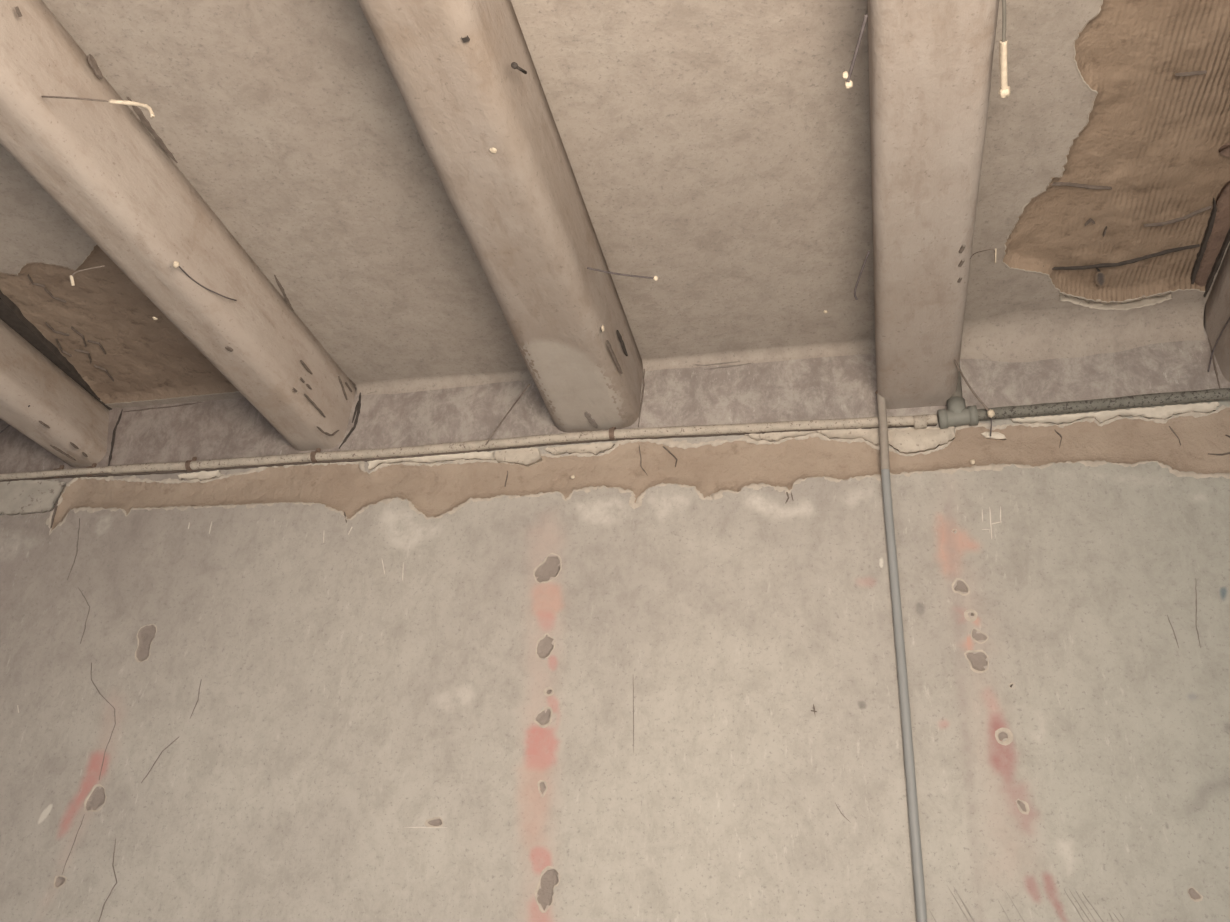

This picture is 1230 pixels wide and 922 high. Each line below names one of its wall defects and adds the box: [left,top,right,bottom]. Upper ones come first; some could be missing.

spalling [1002,0,1230,302]
spalling [0,244,239,405]
spalling [292,360,339,436]
spalling [46,405,1230,535]
crack [0,274,936,783]
spalling [533,553,562,584]
spalling [535,633,555,659]
spalling [952,578,989,673]
spalling [533,707,553,728]
spalling [534,866,560,913]